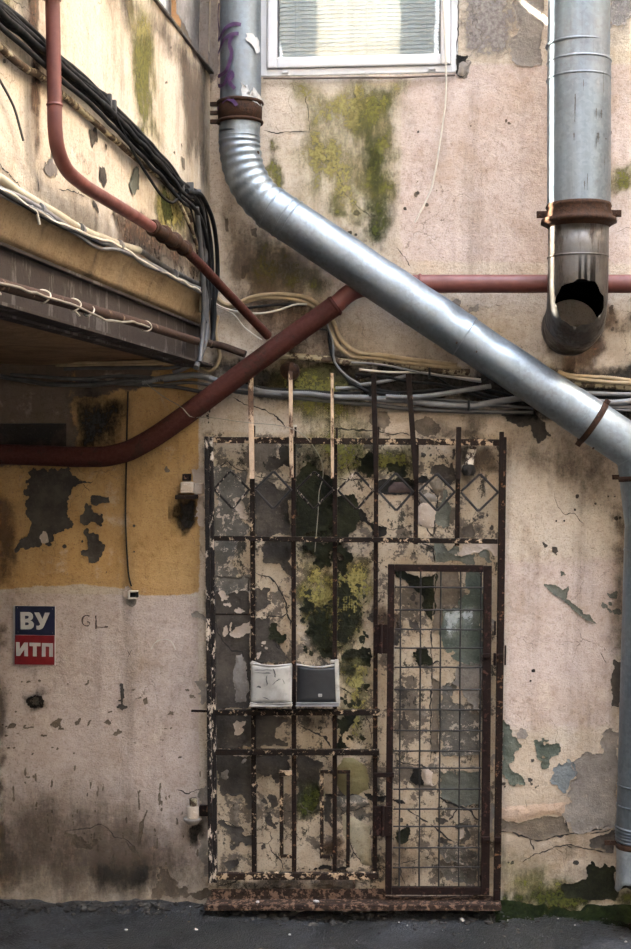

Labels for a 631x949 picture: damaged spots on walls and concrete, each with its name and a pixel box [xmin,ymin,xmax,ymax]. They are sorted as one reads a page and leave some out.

water stain [124,0,137,18]
flaking render [507,0,544,67]
water stain [134,18,205,172]
water stain [330,195,345,216]
water stain [353,90,396,243]
peeling [14,467,110,563]
spalling [378,449,456,529]
peeling [544,571,596,624]
peeling [395,543,495,757]
peeling [610,659,621,707]
peeling [438,720,619,853]
water stain [0,780,199,894]